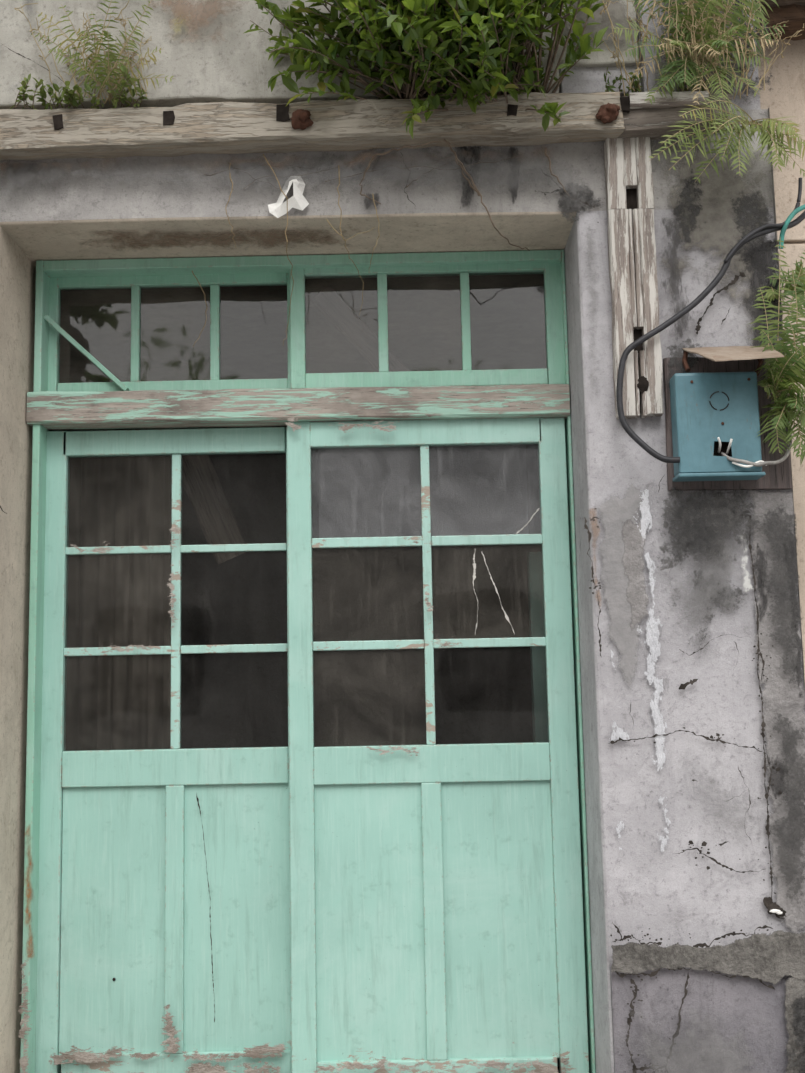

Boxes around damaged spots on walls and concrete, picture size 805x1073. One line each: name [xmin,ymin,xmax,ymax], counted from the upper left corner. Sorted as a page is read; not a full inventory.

leakage [661,142,783,387]
peeling [329,420,400,433]
leakage [633,488,802,773]
leakage [609,721,630,741]
crack [610,515,782,901]
leakage [657,786,673,855]
leakage [768,714,805,904]
peeling [48,1004,288,1073]
peeling [315,1056,426,1073]
peeling [446,1055,570,1073]
crack [625,974,690,1073]